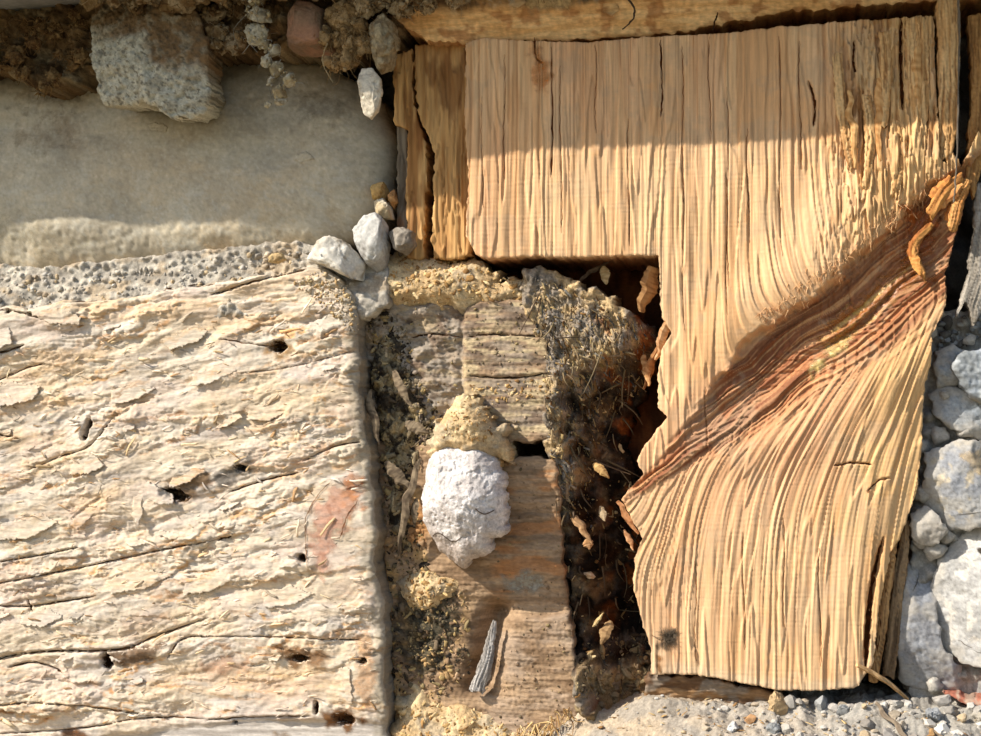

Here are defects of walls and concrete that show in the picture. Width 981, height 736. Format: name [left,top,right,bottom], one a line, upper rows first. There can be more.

crack [164,269,305,295]
crack [0,345,43,380]
crack [29,419,112,470]
crack [227,442,360,494]
crack [304,483,364,564]
crack [0,536,232,610]
crack [864,538,891,667]
crack [0,617,362,673]
crack [5,702,305,734]